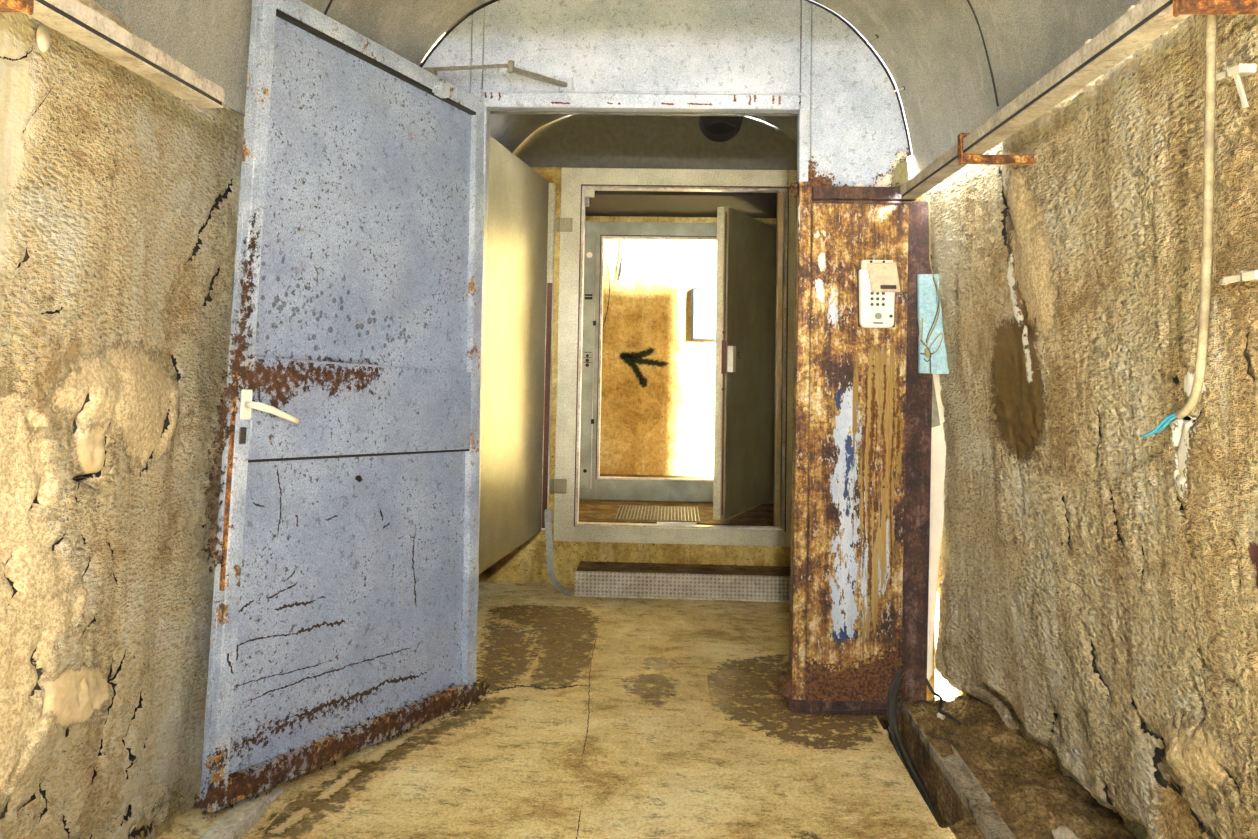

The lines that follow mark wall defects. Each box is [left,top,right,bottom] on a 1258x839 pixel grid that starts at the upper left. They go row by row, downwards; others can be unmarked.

rust [201,211,410,573]
rust [707,341,910,750]
peeling [815,252,838,328]
peeling [829,382,890,643]
leakage [990,193,1049,463]
rust [193,679,490,819]
leakage [255,605,600,839]
crack [1090,641,1216,839]